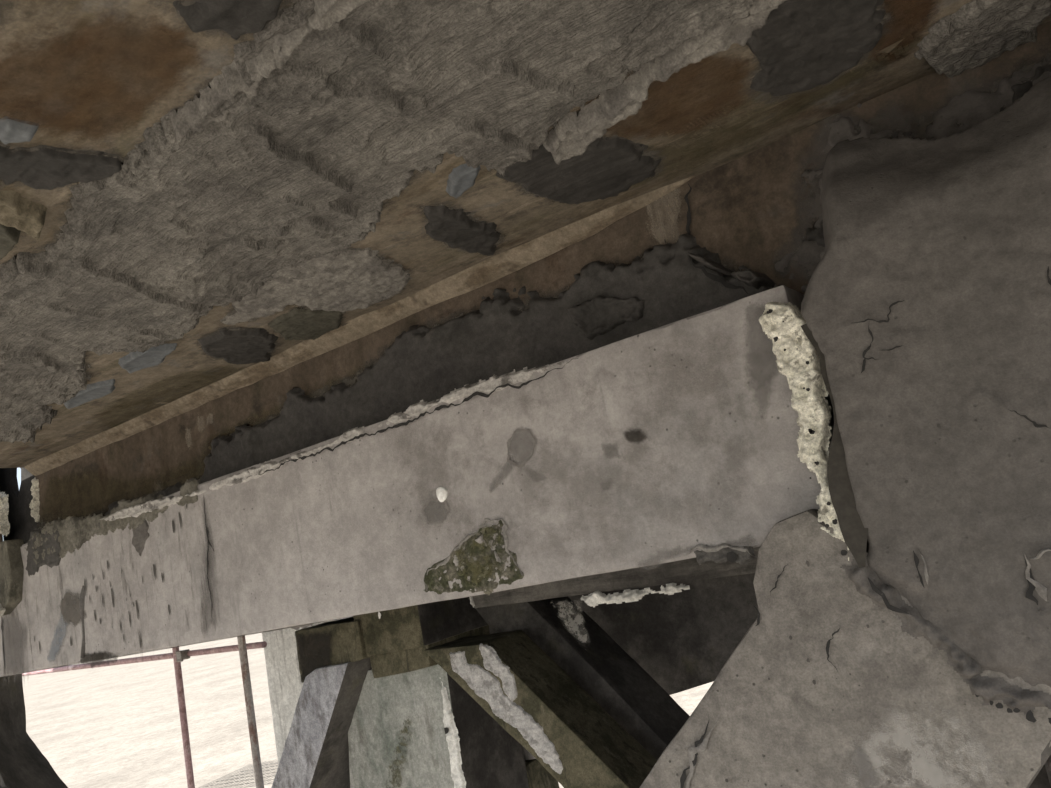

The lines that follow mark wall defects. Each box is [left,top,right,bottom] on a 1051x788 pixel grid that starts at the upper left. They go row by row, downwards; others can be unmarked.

peeling [378,360,568,427]
spalling [759,301,849,568]
spalling [0,492,10,537]
peeling [25,426,364,576]
spalling [84,561,141,648]
spalling [423,518,524,607]
peeling [581,583,690,608]
crack [868,578,912,615]
crack [913,550,929,588]
crack [1024,553,1047,605]
peeling [449,643,563,774]
crack [680,714,719,788]